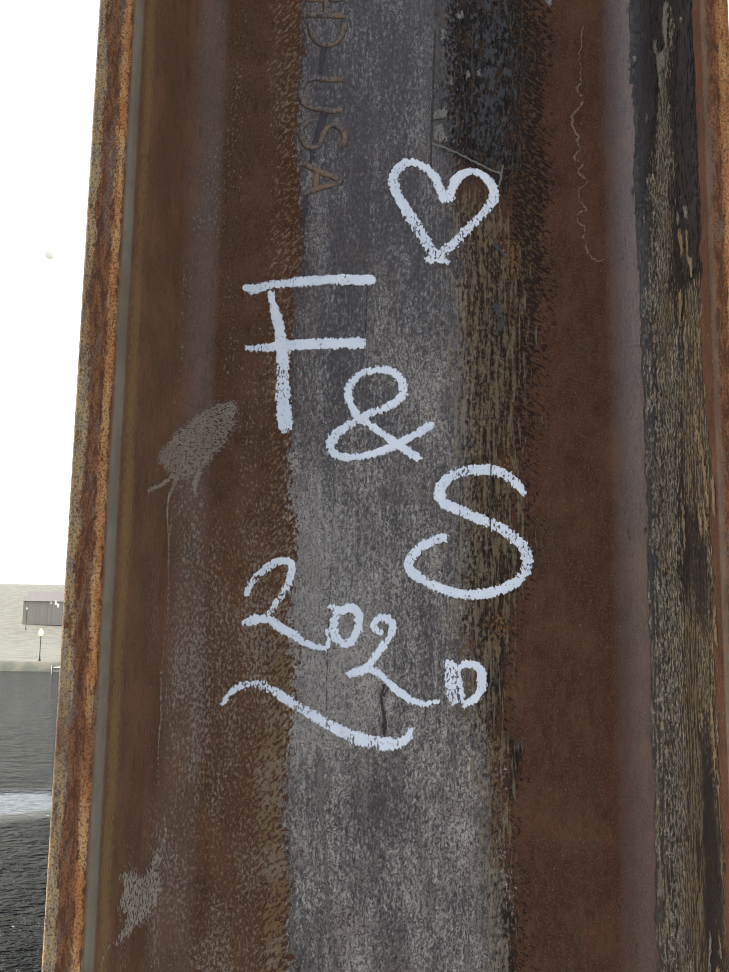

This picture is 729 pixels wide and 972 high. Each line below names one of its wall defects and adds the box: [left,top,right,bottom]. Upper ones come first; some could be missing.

peeling [626,0,700,291]
rust [678,229,693,278]
rust [694,406,716,538]
peeling [708,931,722,972]